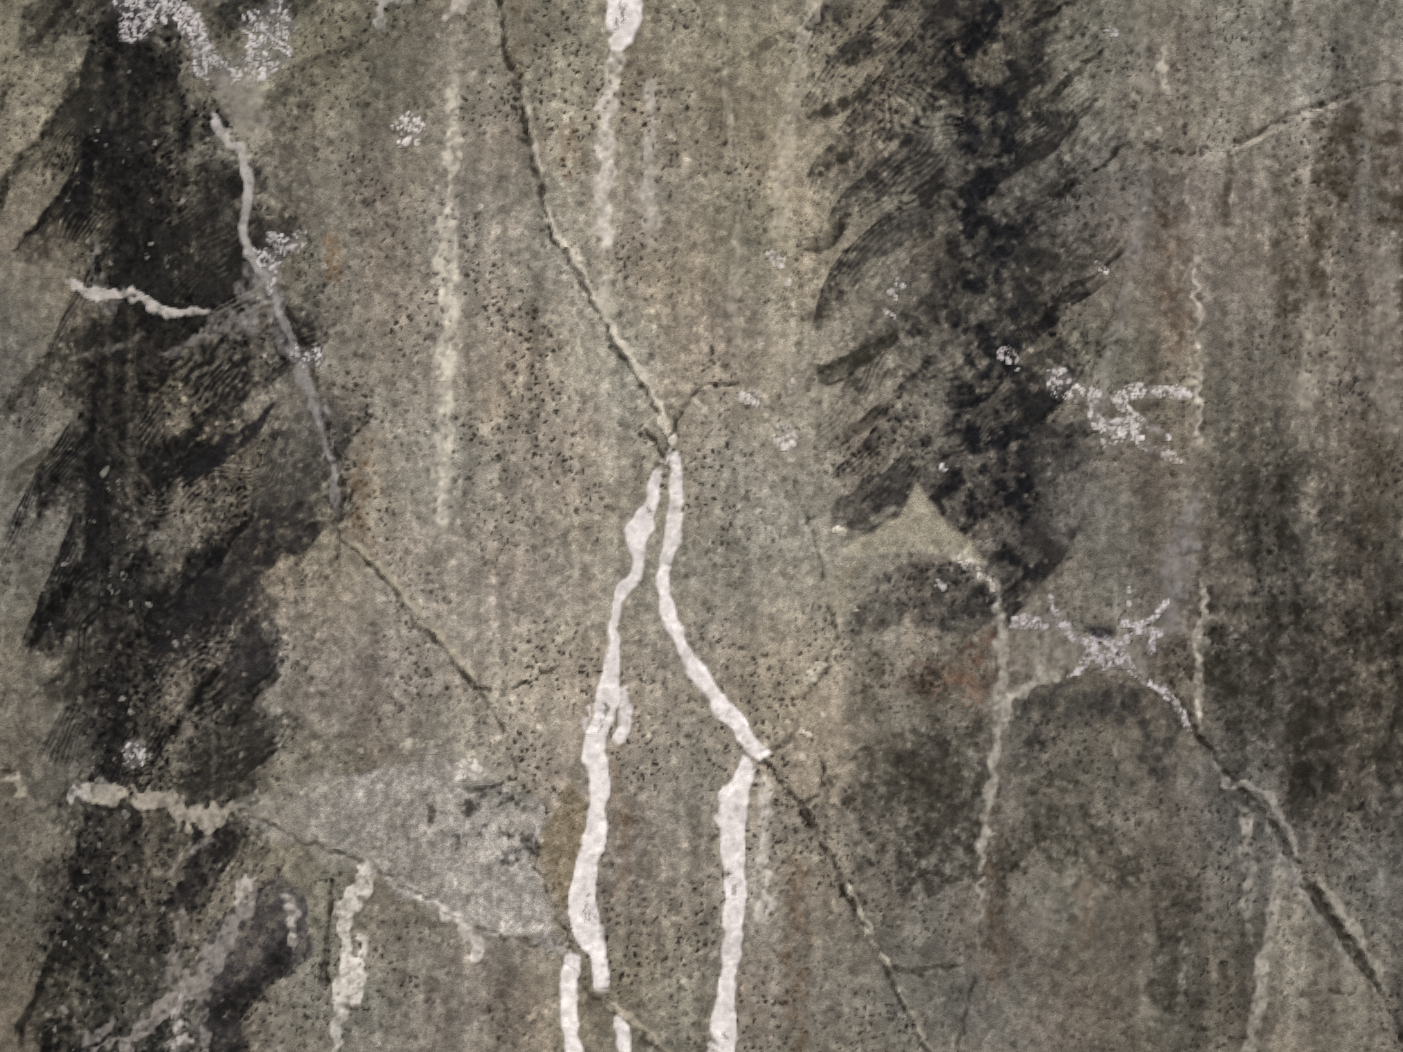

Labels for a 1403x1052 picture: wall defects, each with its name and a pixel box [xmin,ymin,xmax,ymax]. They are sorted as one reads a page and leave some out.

crack [0,767,32,780]
damp [0,0,492,1052]
crack [282,293,561,796]
crack [245,818,676,1052]
damp [488,266,545,583]
crack [494,0,823,457]
crack [757,475,978,1052]
damp [558,0,1403,1052]
crack [1090,0,1403,440]
crack [1168,680,1403,1047]